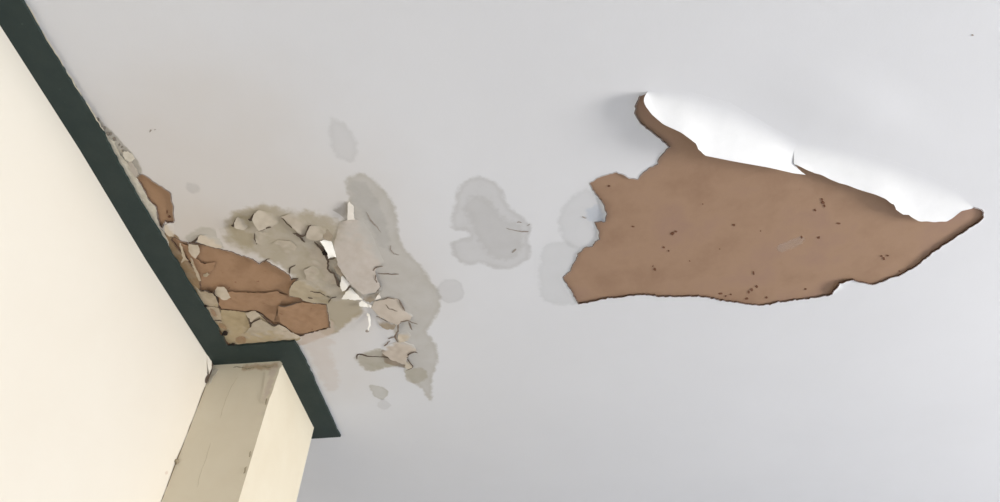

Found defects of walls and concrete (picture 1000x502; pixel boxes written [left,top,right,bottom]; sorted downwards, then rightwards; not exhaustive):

peeling [26,3,336,346]
crack [314,202,416,346]
peeling [352,317,417,373]
water stain [325,114,466,403]
water stain [446,174,601,307]
peeling [561,90,986,307]